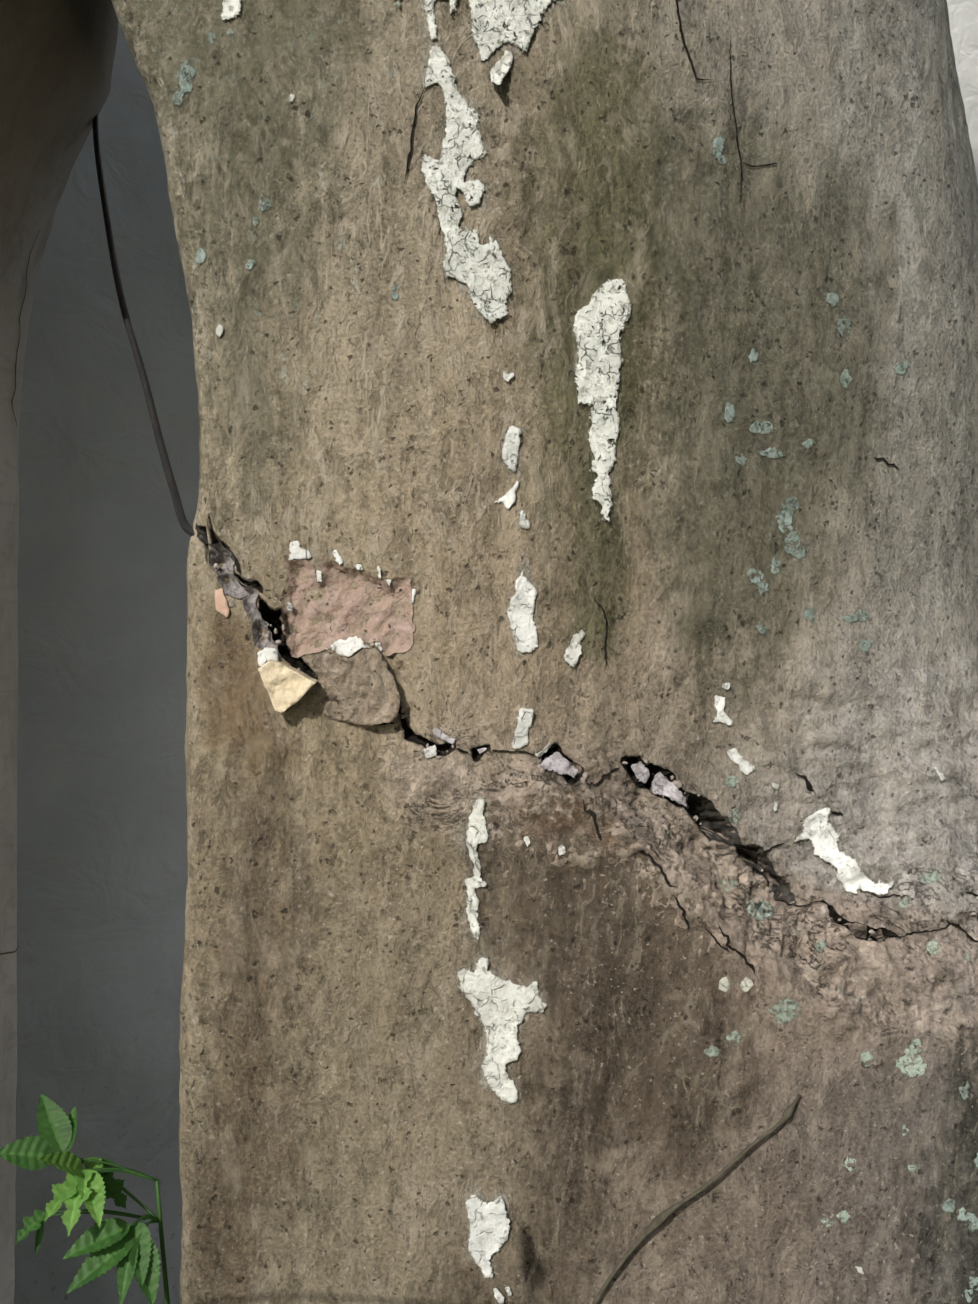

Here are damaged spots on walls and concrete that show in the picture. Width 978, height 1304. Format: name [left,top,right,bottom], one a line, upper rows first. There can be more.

peeling [417,0,571,324]
crack [675,0,778,198]
peeling [567,279,632,522]
crack [195,523,317,679]
peeling [505,555,538,655]
crack [591,594,608,670]
peeling [456,793,547,1105]
crack [373,705,978,947]
crack [633,850,758,978]
peeling [790,802,895,895]
peeling [464,1188,512,1304]
damp [919,1047,978,1304]